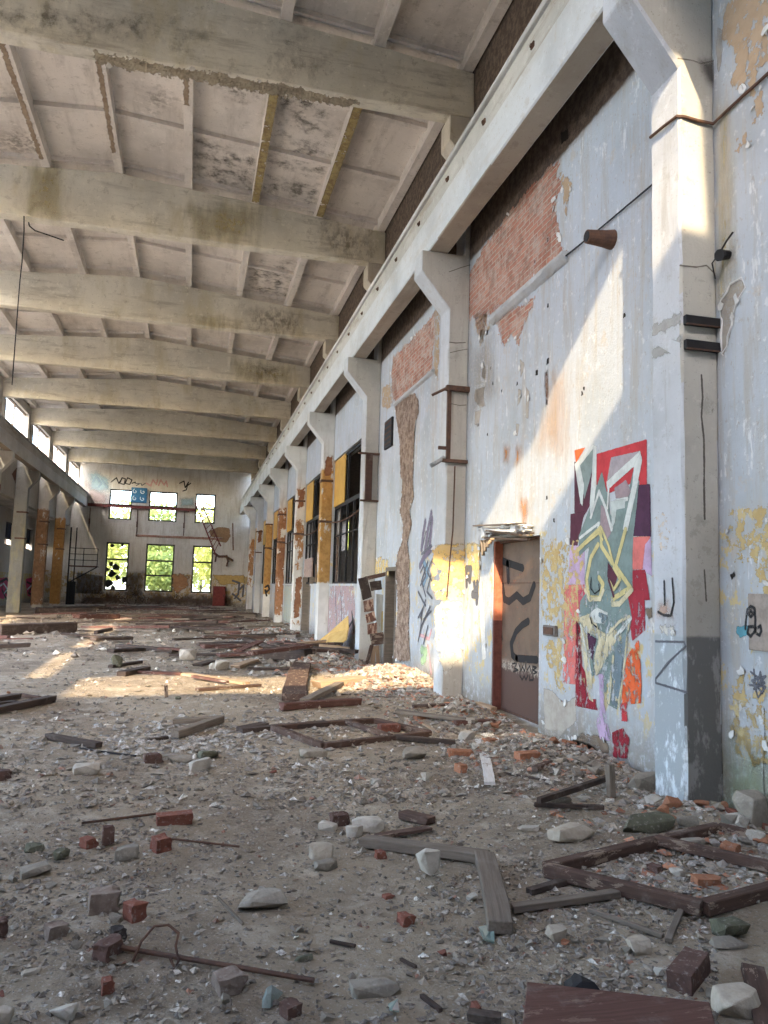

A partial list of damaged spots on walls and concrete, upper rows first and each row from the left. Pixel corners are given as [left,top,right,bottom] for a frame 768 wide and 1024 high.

spalling [0,43,43,159]
spalling [93,49,360,153]
leakage [202,94,311,203]
leakage [293,107,362,217]
peeling [716,0,768,153]
flaking render [469,159,572,347]
flaking render [718,277,746,356]
peeling [324,455,333,476]
flaking render [375,310,440,661]
peeling [725,504,768,594]
peeling [540,538,609,753]
peeling [729,665,768,765]